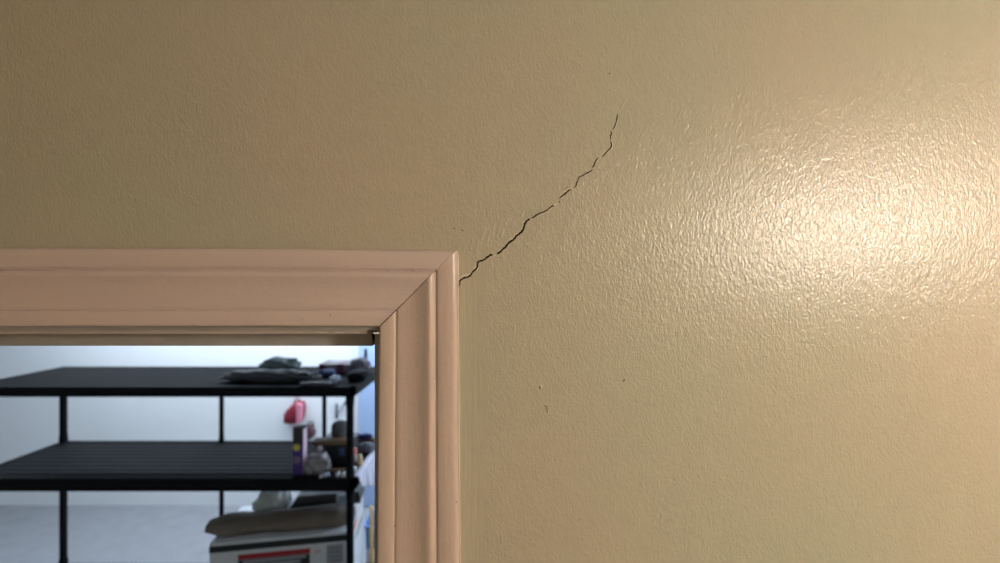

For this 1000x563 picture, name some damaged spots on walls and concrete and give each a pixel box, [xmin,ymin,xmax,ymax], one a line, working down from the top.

crack [380,114,618,326]